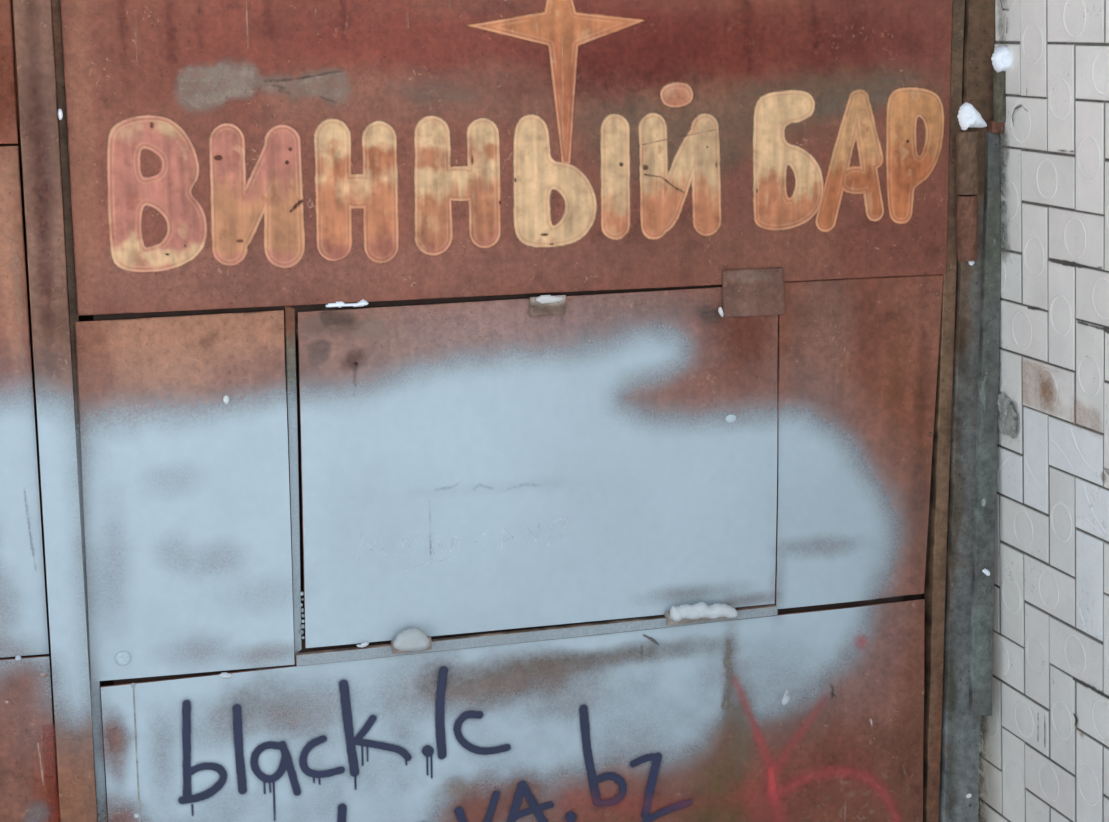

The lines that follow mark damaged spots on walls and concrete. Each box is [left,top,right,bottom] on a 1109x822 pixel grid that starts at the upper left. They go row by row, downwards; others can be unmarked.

rust [42,724,57,777]
rust [48,791,61,822]